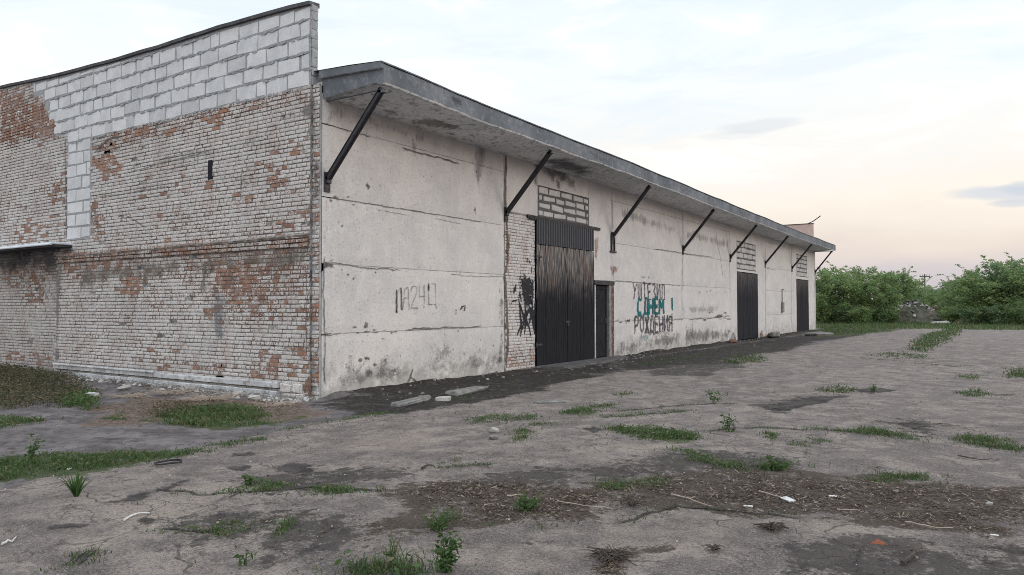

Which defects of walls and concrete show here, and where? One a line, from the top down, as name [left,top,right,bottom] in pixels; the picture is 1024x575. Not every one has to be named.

peeling [0,84,56,147]
peeling [201,108,228,130]
peeling [92,123,184,181]
peeling [64,259,152,297]
peeling [203,268,309,330]
water stain [620,328,728,354]